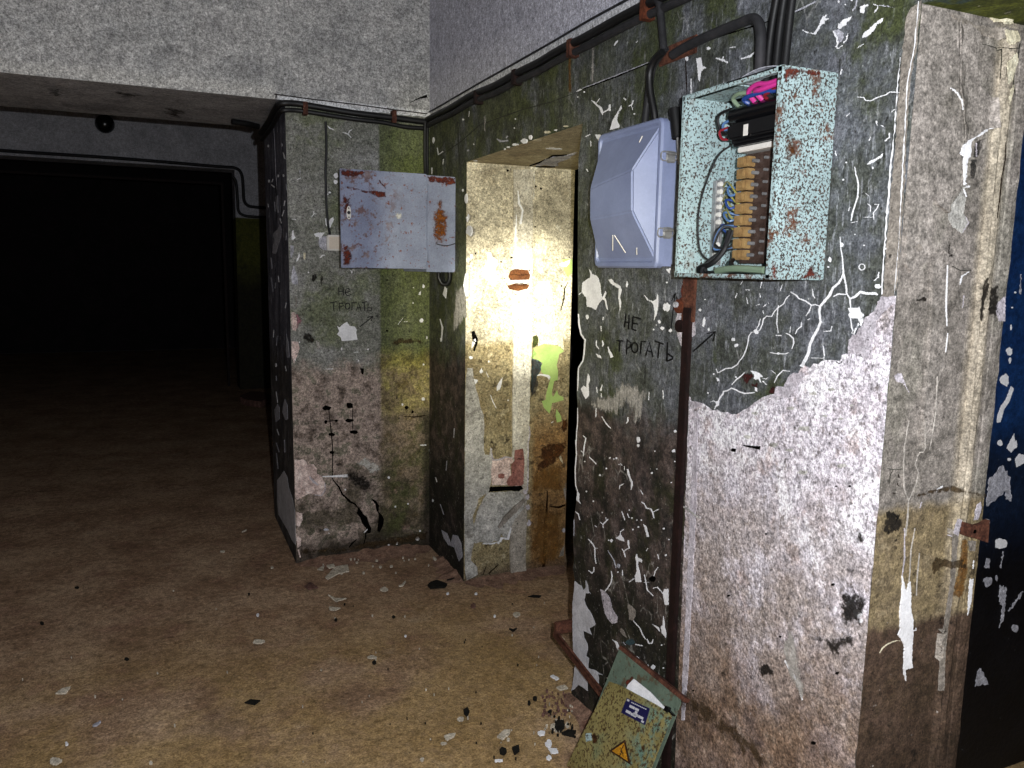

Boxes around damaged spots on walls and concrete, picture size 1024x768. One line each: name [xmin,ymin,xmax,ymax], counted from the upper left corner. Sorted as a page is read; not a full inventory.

crack [322,403,384,548]
flaking render [441,331,531,580]
peeling [462,189,669,691]
crack [711,167,879,409]
flaking render [672,0,922,768]
peeling [935,435,1024,691]
peeling [997,347,1014,423]